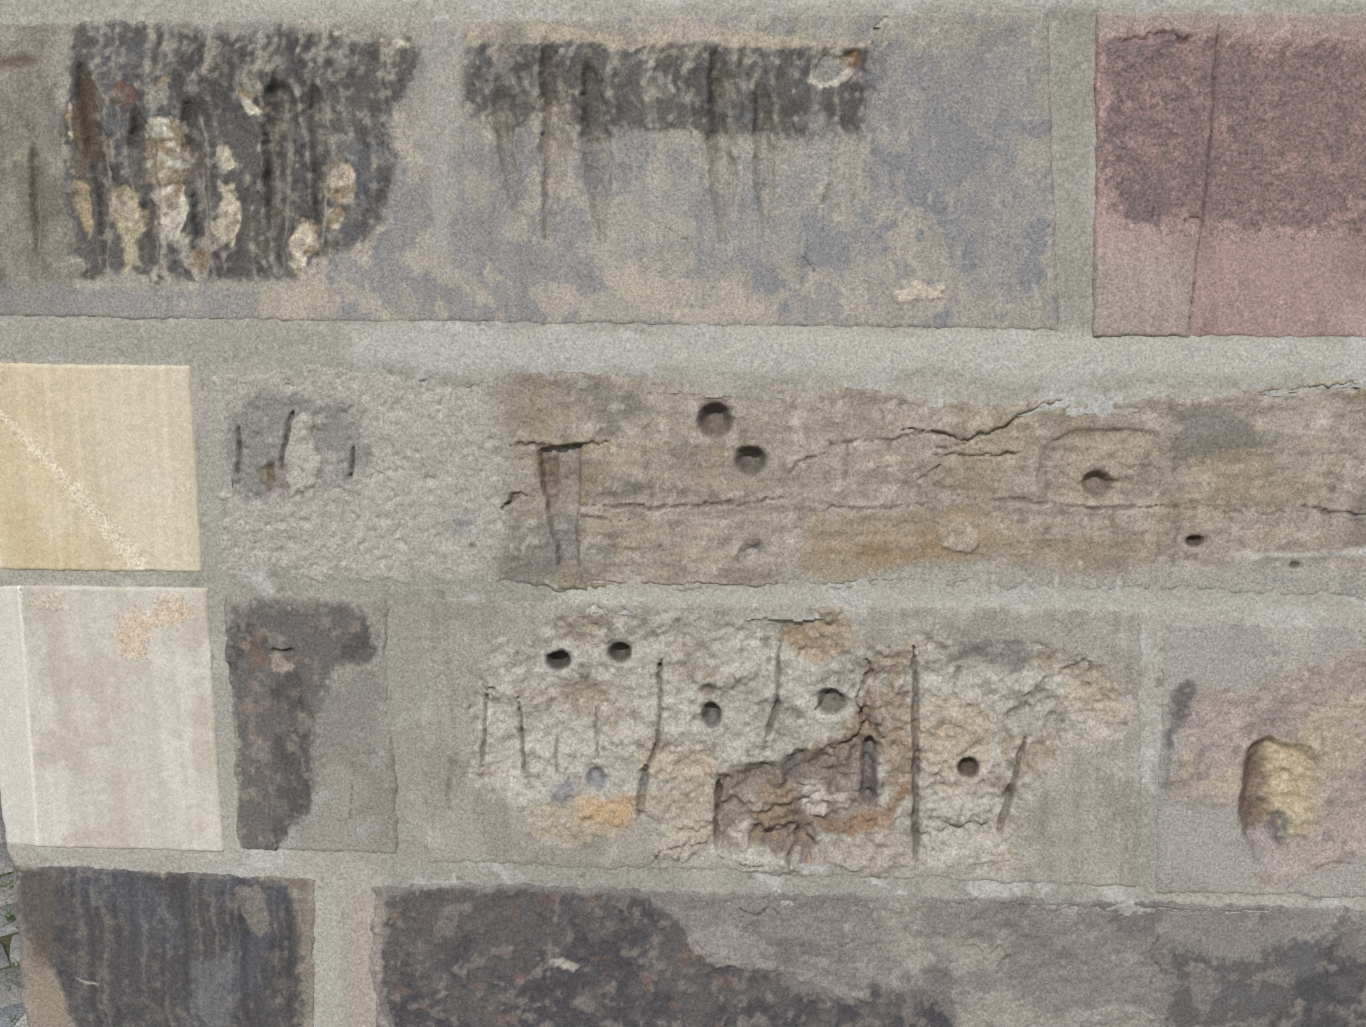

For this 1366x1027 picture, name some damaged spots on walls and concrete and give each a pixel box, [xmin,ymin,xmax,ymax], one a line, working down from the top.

crack [1114,12,1225,337]
crack [1029,396,1119,416]
crack [503,434,615,452]
crack [572,421,1366,528]
crack [496,489,533,515]
crack [583,575,776,591]
crack [866,576,955,587]
spalling [455,588,1224,1027]
spalling [1235,731,1328,876]